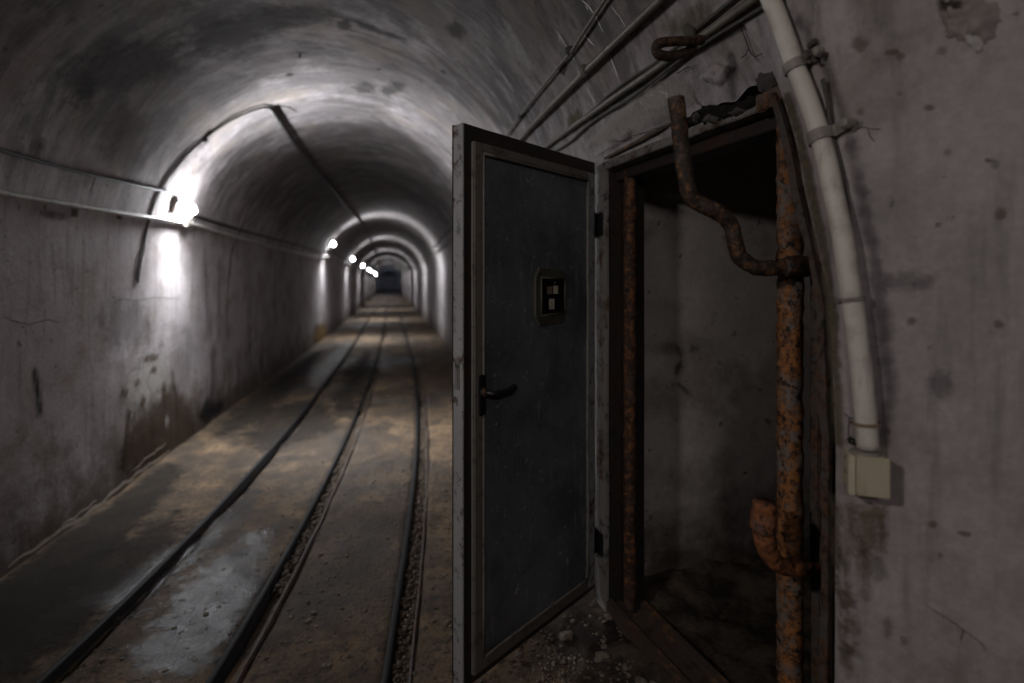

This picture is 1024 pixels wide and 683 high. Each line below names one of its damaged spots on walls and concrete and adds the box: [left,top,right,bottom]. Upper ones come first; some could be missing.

spalling [938,0,1002,53]
spalling [689,71,778,125]
water stain [122,370,223,473]
water stain [94,483,276,683]